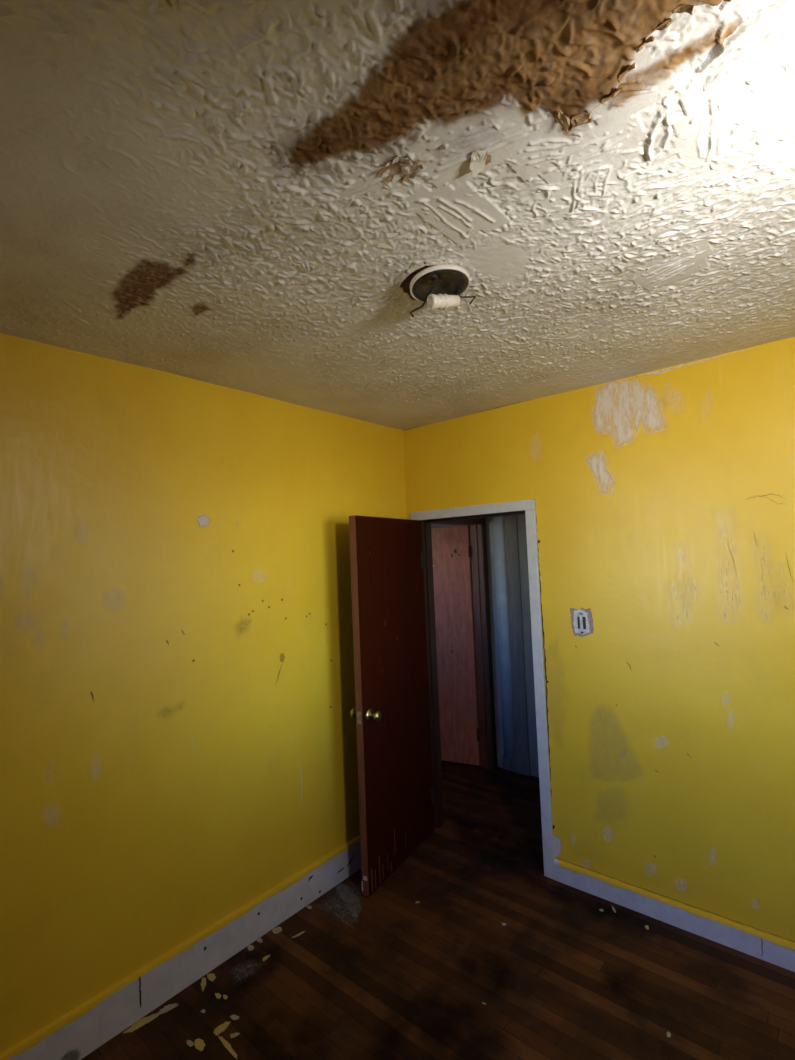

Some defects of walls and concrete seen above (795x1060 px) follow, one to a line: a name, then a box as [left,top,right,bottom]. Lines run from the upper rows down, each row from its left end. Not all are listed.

water stain [292,0,737,163]
peeling [595,354,728,446]
peeling [588,453,612,492]